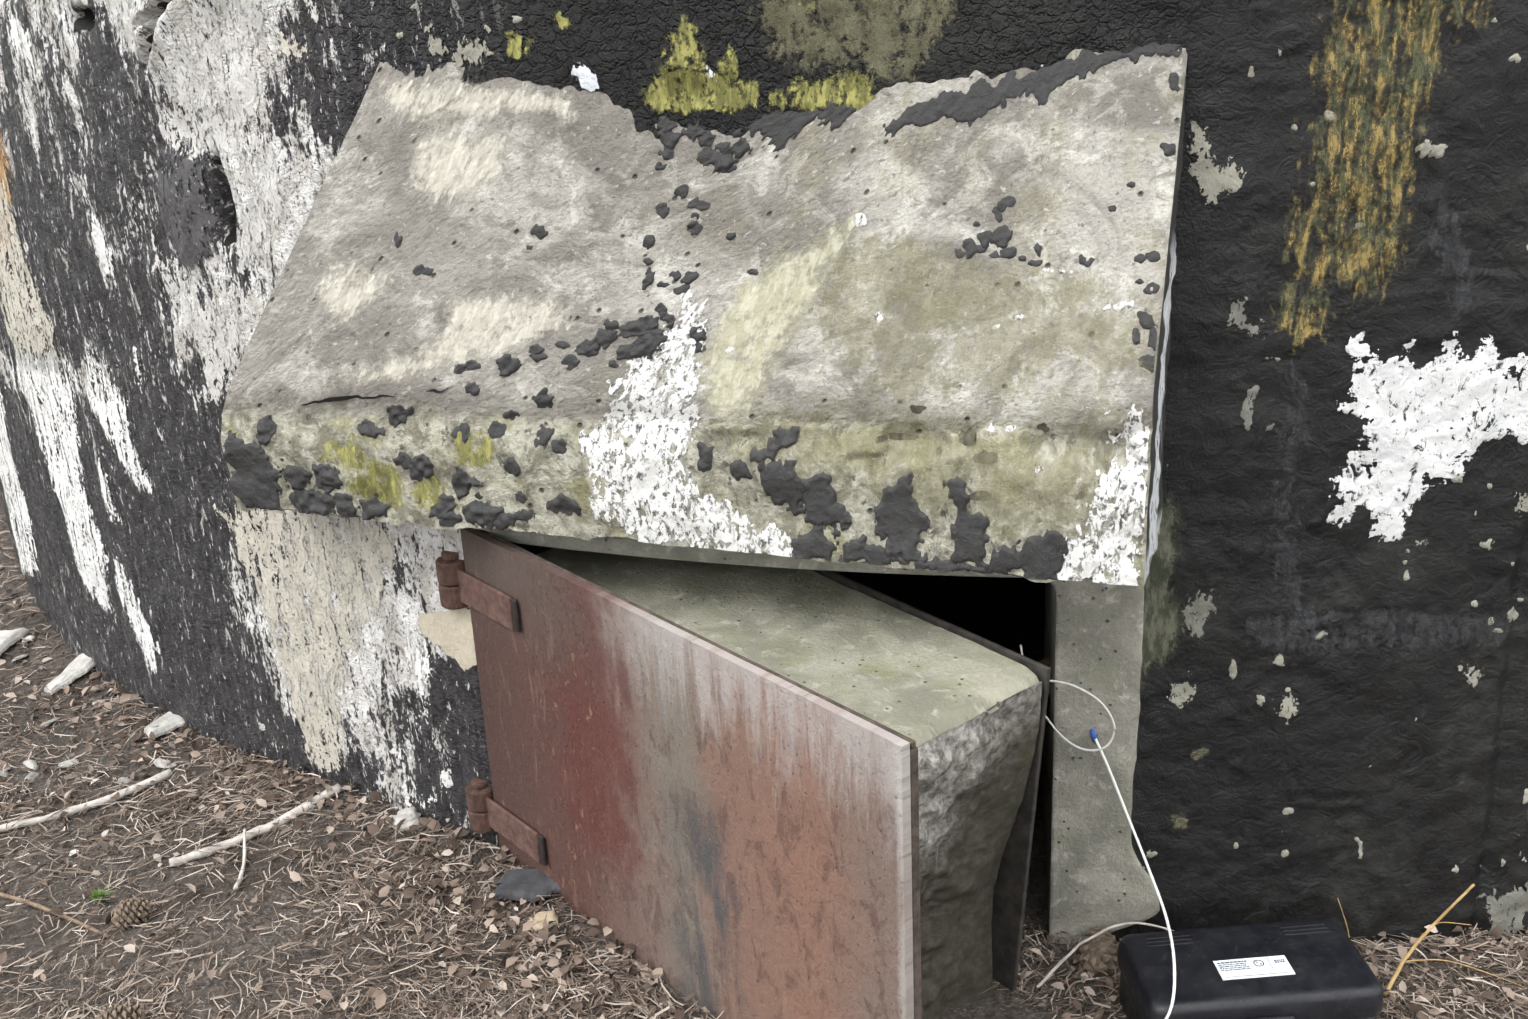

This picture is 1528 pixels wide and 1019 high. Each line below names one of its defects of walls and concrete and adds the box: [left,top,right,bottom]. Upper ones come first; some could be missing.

peeling [6,0,35,70]
flaking render [157,0,316,280]
peeling [655,116,752,174]
peeling [1160,119,1247,205]
flaking render [151,230,247,406]
spalling [340,209,858,417]
peeling [0,180,160,675]
peeling [429,457,582,531]
spalling [697,404,1150,586]
peeling [1326,331,1528,581]
spalling [44,653,95,695]
flaking render [1478,882,1528,938]